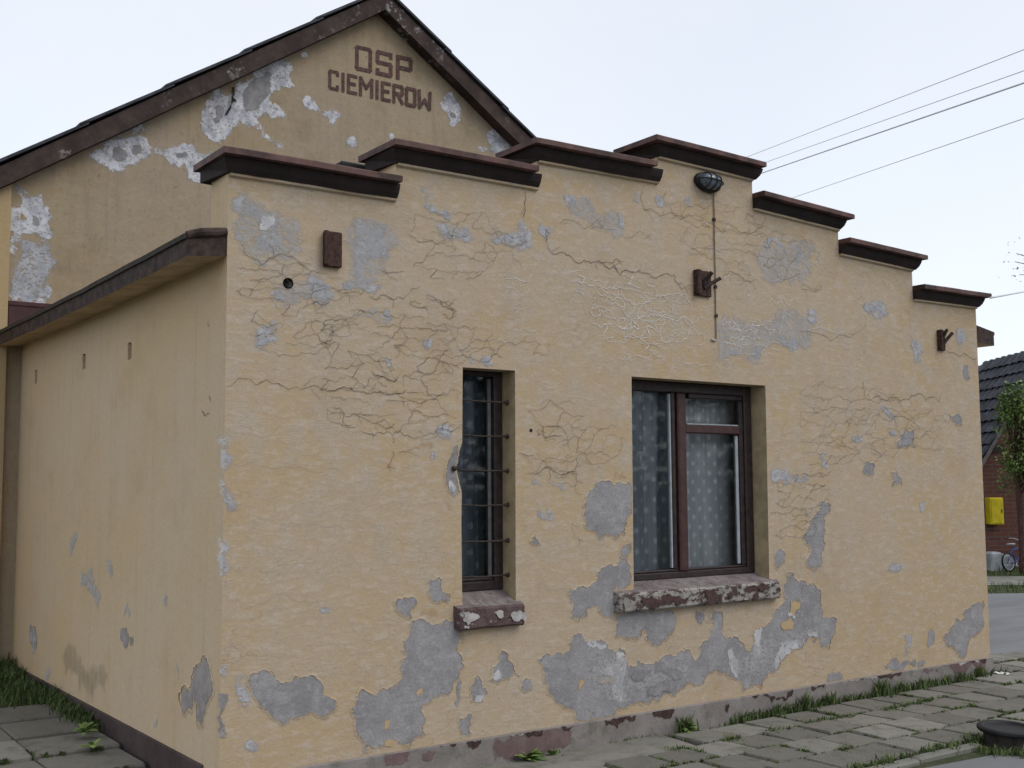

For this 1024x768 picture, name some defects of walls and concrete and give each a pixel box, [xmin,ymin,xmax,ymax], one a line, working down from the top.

peeling [89,59,295,183]
peeling [9,186,56,303]
crack [226,190,862,469]
crack [522,400,622,487]
crack [770,381,951,539]
peeling [176,478,838,766]
peeling [806,599,986,691]